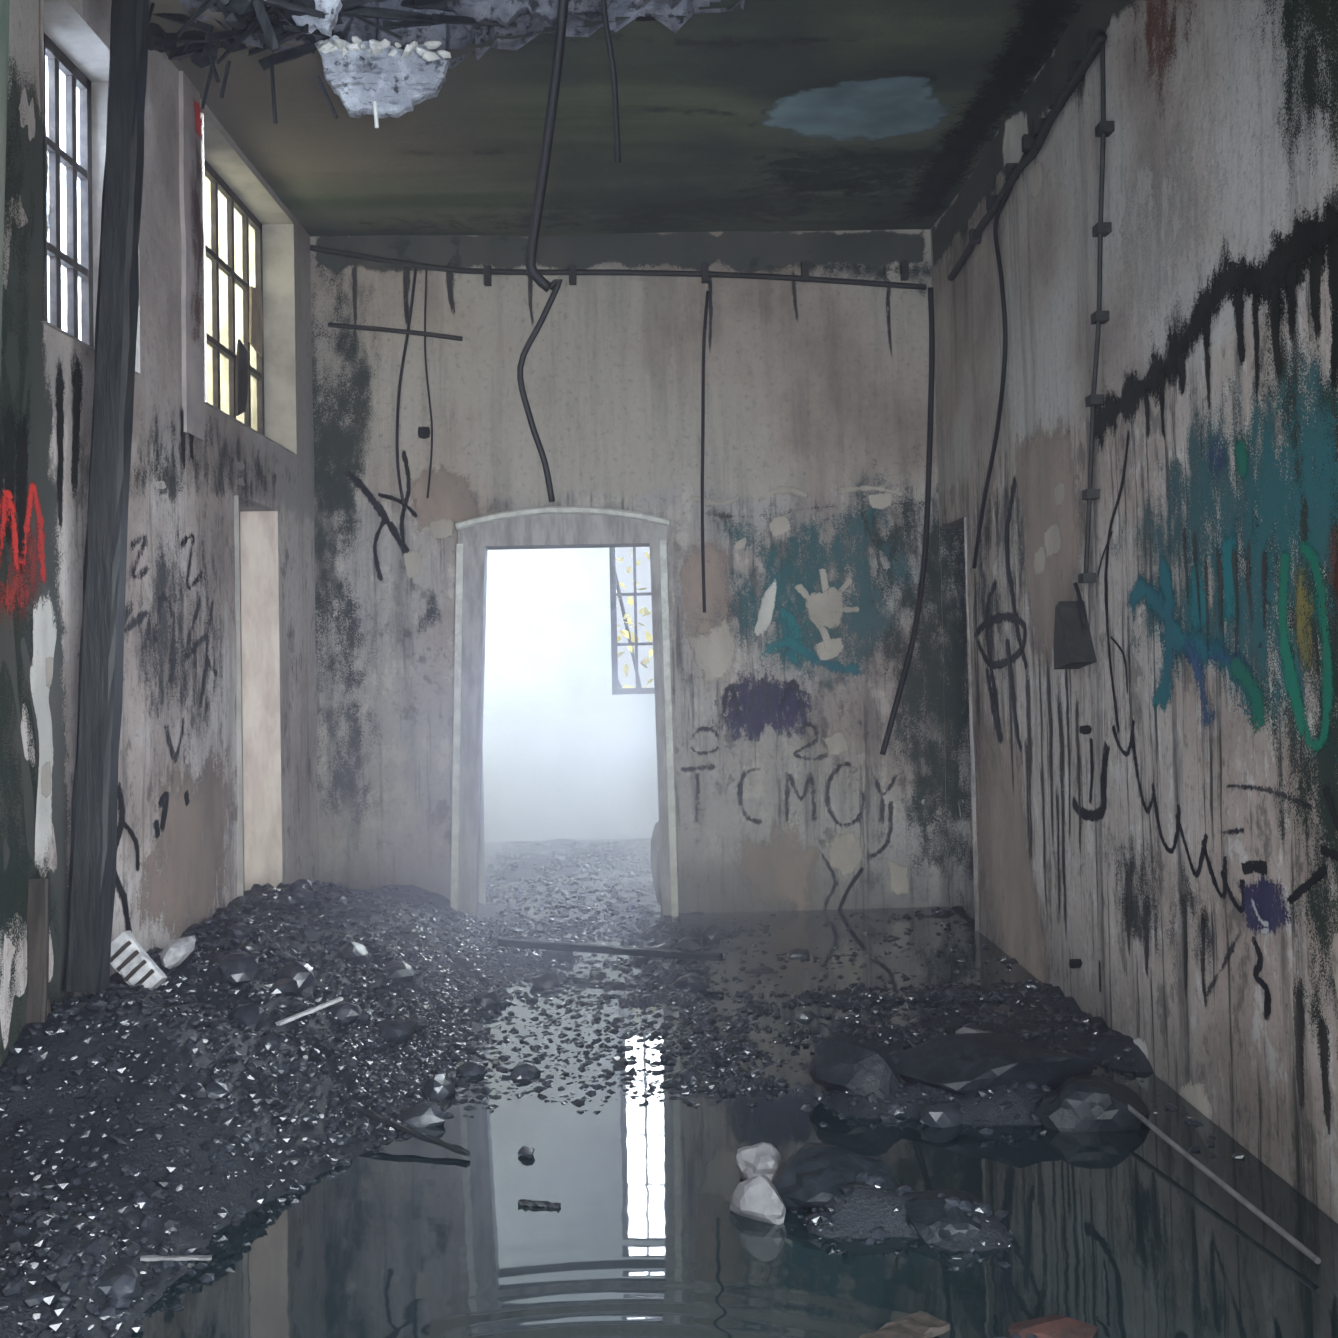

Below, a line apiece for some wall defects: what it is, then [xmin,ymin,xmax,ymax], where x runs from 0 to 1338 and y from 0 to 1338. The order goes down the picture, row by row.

spalling [179,0,745,69]
water stain [310,0,1140,939]
water stain [1089,0,1338,1135]